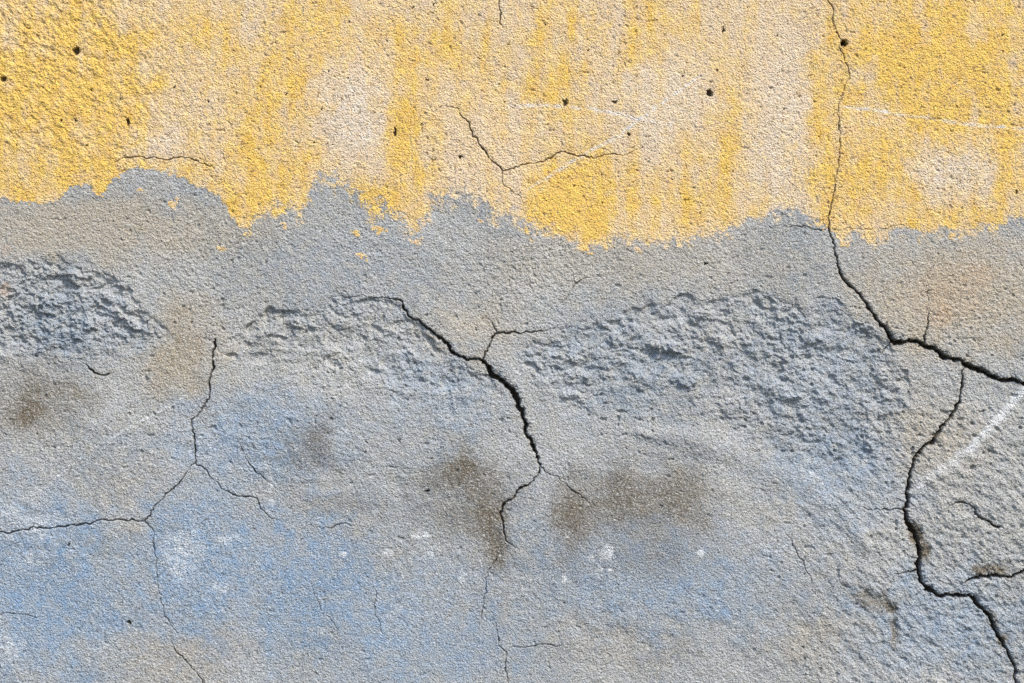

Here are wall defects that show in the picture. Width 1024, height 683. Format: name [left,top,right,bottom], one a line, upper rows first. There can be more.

peeling [0,161,246,236]
crack [436,101,657,210]
peeling [903,148,991,197]
spalling [0,257,164,365]
spalling [219,300,508,424]
spalling [517,292,911,495]
crack [760,0,1024,683]
crack [0,334,366,683]
crack [327,267,609,683]
leakage [402,438,741,588]